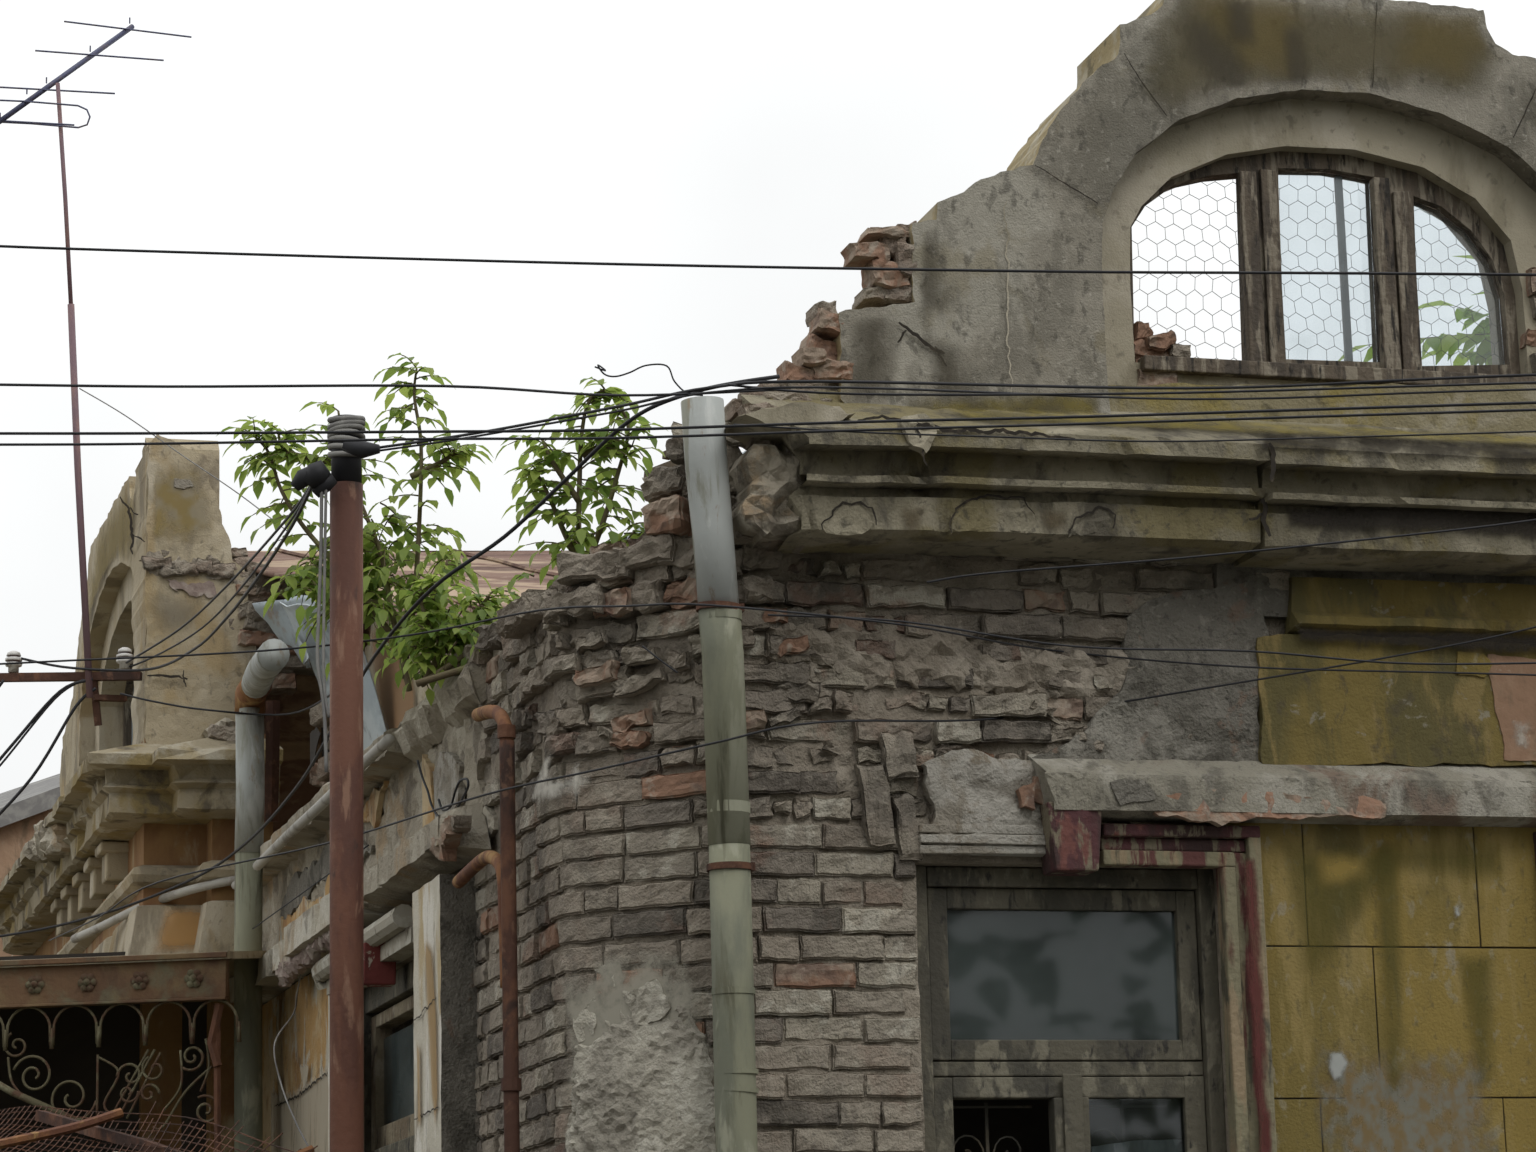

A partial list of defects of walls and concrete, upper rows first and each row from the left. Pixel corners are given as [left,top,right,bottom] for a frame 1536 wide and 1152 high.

spalling [724,221,918,454]
spalling [1519,267,1536,377]
spalling [729,476,739,511]
spalling [139,547,315,696]
spalling [422,421,714,1152]
spalling [734,531,1214,1152]
leakage [1301,850,1394,944]
peeling [271,1065,328,1152]
peeling [417,946,437,1122]